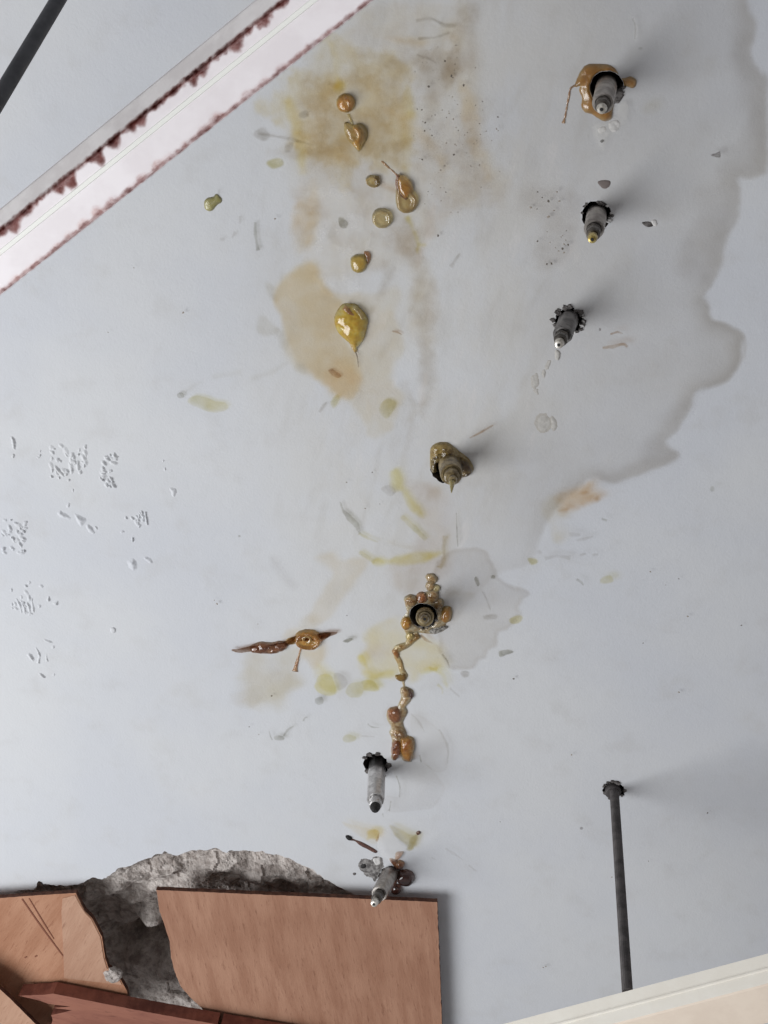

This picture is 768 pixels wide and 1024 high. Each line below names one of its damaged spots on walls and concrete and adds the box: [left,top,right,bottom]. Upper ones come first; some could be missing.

rust [0,0,288,235]
spalling [11,848,355,1010]